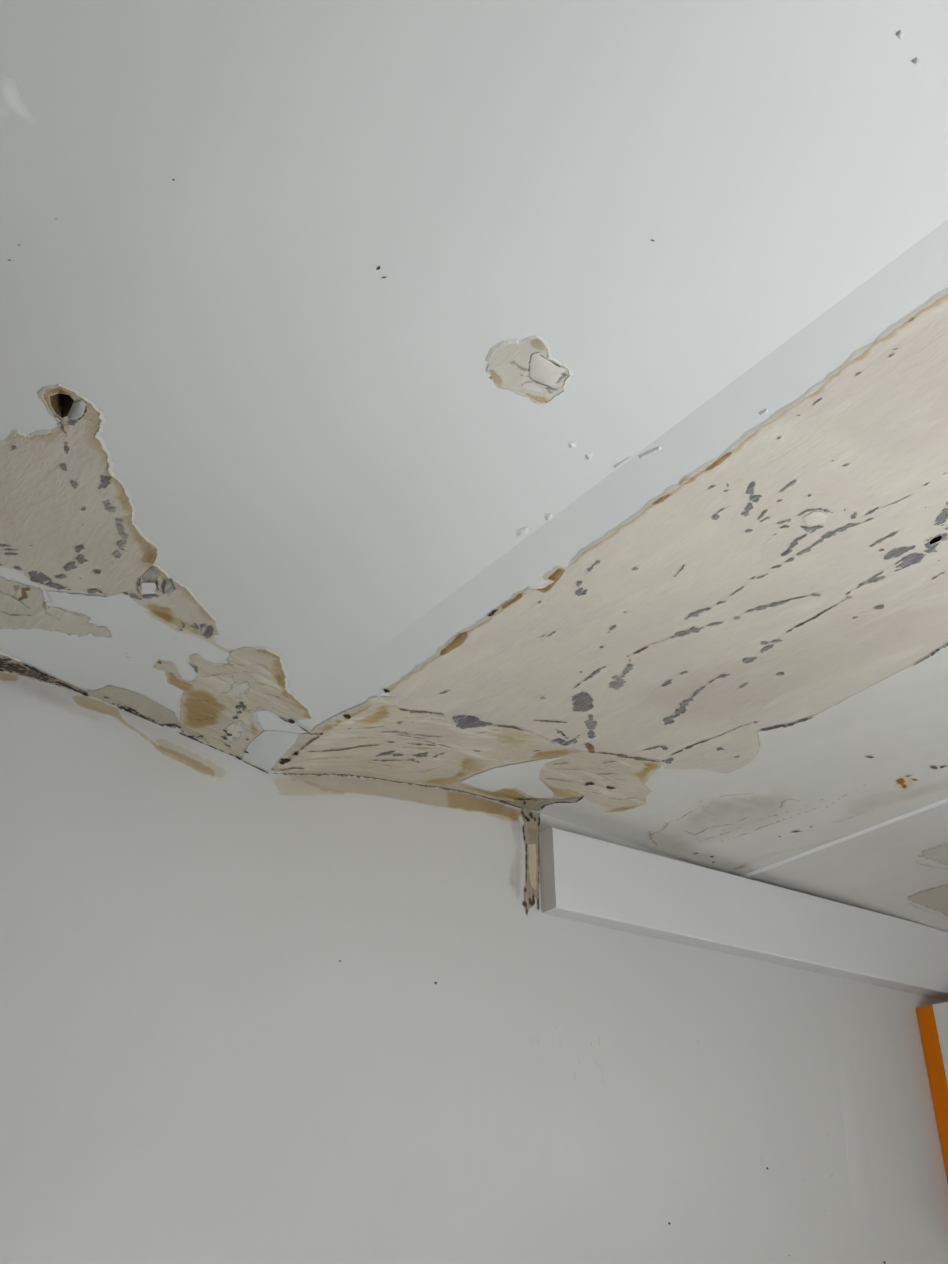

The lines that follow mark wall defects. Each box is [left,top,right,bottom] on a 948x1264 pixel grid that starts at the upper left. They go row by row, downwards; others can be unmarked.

peeling [0,383,219,639]
peeling [154,288,948,813]
damp [0,657,88,696]
damp [104,697,238,758]
peeling [908,885,948,917]